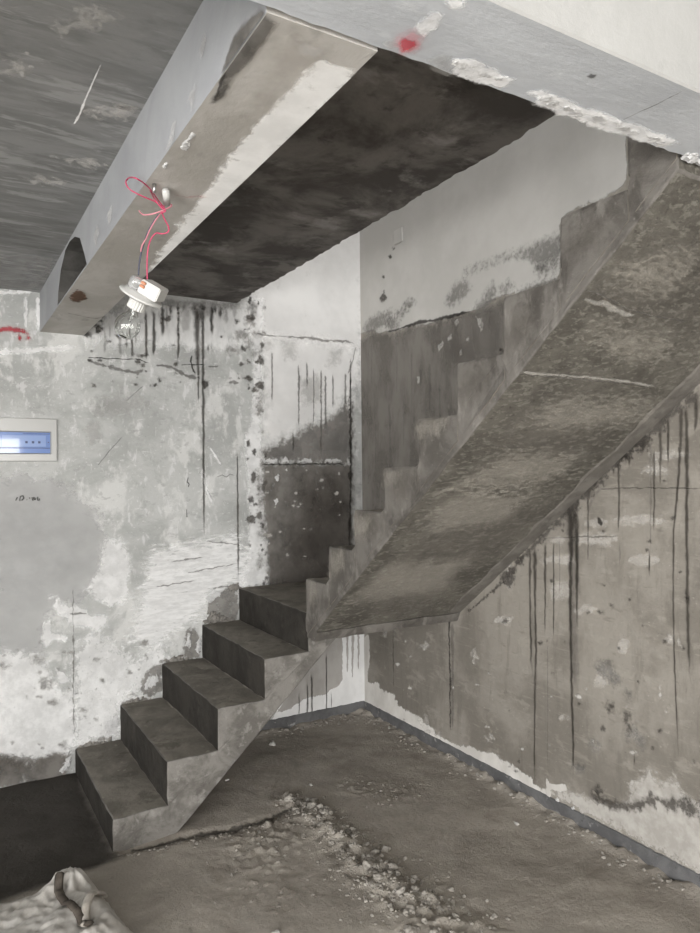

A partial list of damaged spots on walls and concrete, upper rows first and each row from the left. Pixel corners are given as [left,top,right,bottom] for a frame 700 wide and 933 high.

spalling [453,59,510,87]
peeling [180,132,196,151]
spalling [531,91,675,146]
water stain [519,237,560,288]
corrosion [69,289,87,302]
water stain [366,302,412,333]
water stain [84,297,273,514]
water stain [237,361,353,585]
spalling [0,299,269,773]
water stain [468,392,698,771]
spalling [278,635,700,870]
water stain [591,784,700,816]